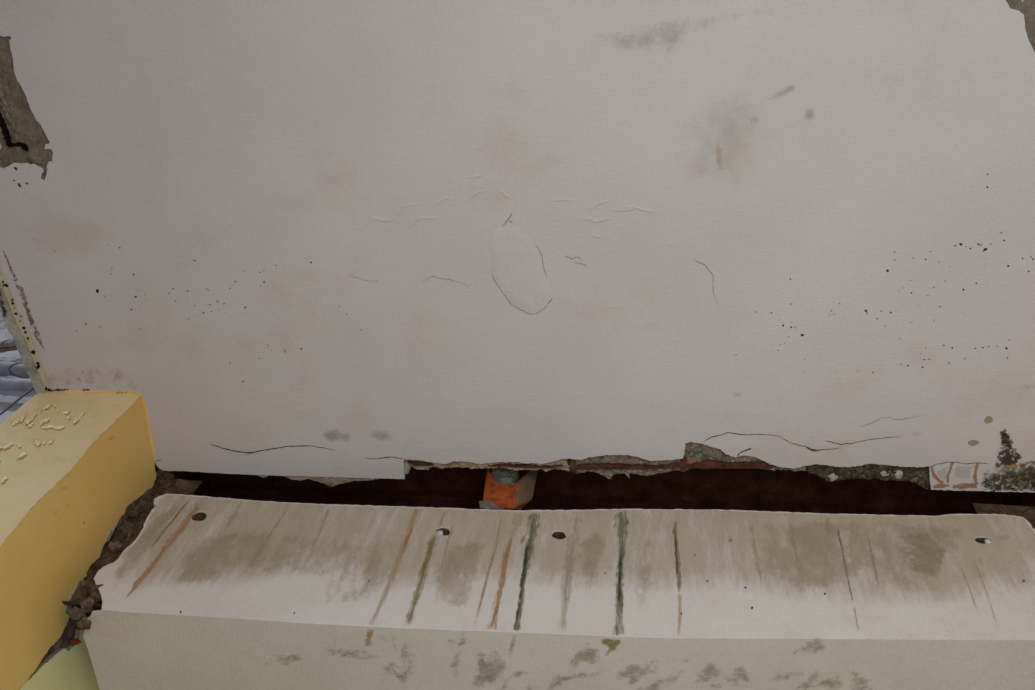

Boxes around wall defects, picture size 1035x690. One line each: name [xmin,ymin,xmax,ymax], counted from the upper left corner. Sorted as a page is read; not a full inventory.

spalling [1006,0,1035,52]
spalling [0,36,53,187]
damp [0,252,43,369]
crack [213,445,332,454]
spalling [284,476,382,487]
spalling [404,442,929,490]
crack [705,432,900,456]
rust [931,463,980,489]
damp [982,429,1035,491]
rust [374,510,417,618]
rust [477,527,512,629]
damp [147,495,1019,660]